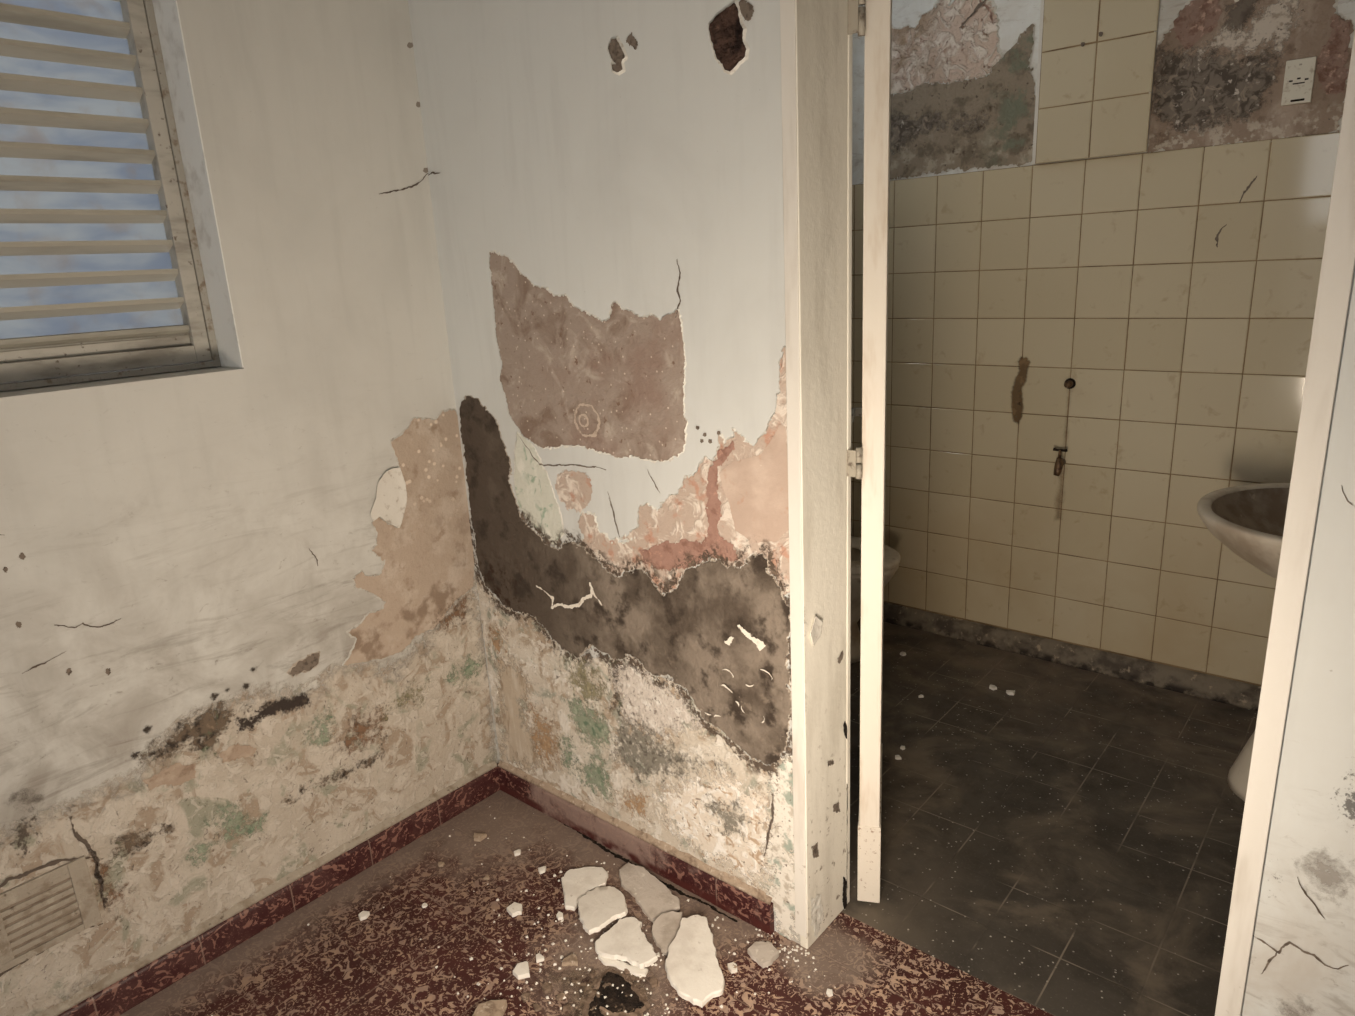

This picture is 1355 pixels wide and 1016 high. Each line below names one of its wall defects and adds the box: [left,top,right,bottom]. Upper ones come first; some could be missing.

spalling [607,32,638,76]
spalling [708,0,754,75]
flaking render [890,0,1036,180]
flaking render [1146,0,1355,154]
crack [380,172,439,194]
corrosion [1011,357,1030,423]
flaking render [0,250,825,1016]
damp [131,668,429,804]
damp [186,802,267,866]
crack [1255,937,1349,974]